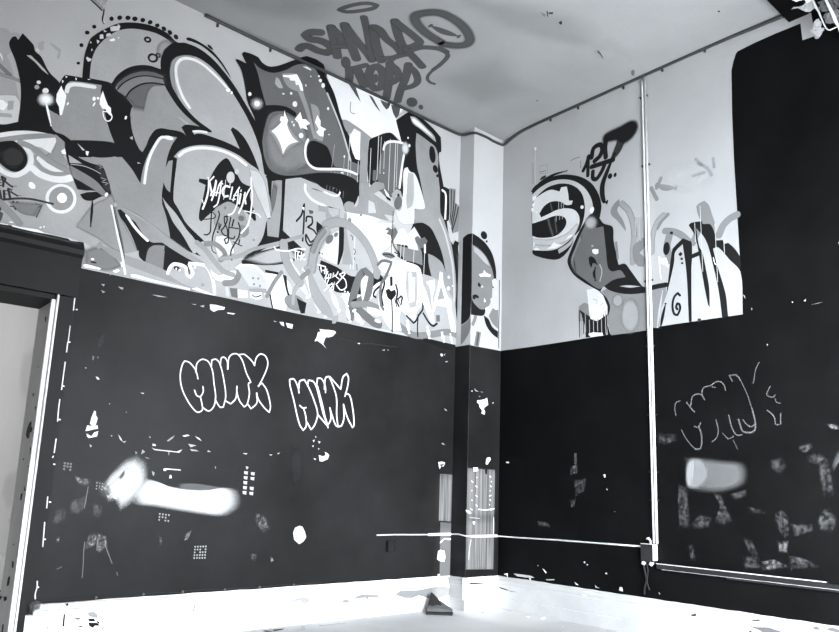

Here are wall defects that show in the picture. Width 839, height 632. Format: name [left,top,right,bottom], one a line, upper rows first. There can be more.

peeling [315,329,336,348]
peeling [86,411,98,447]
peeling [135,435,200,459]
peeling [747,619,786,632]